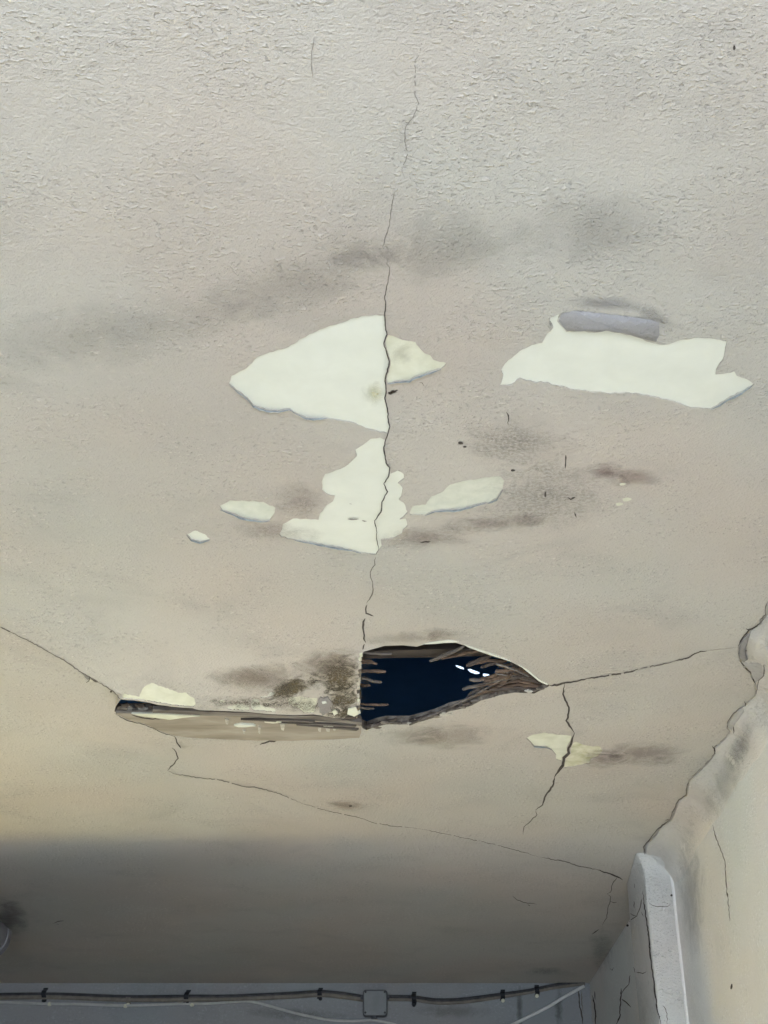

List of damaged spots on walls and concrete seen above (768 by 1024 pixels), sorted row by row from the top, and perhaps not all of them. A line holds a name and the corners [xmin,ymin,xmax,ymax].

crack [349,43,422,649]
peeling [500,314,753,412]
peeling [220,315,504,556]
peeling [186,531,210,545]
spalling [116,652,411,741]
leakage [216,660,362,718]
spalling [425,640,548,693]
peeling [527,732,602,767]
crack [1,602,768,1024]